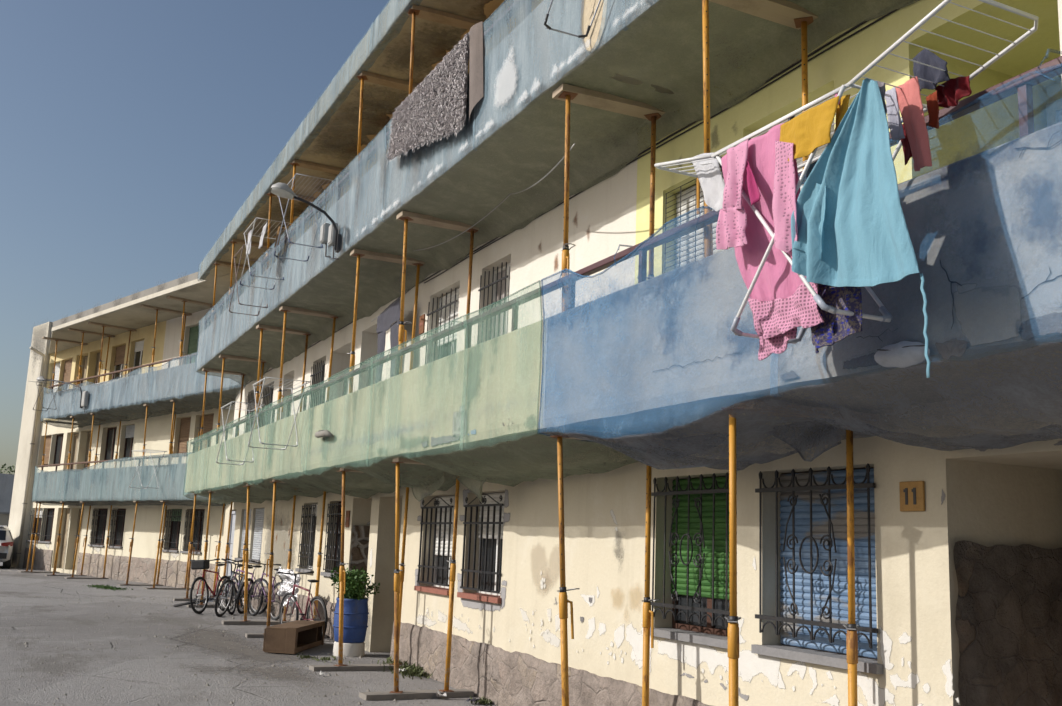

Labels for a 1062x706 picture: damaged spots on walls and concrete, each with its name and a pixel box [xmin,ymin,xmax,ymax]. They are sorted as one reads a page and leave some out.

crack [1015,130,1062,158]
crack [940,260,962,329]
peeling [417,609,480,633]
peeling [577,587,839,706]
peeling [857,627,930,706]
peeling [942,659,959,703]